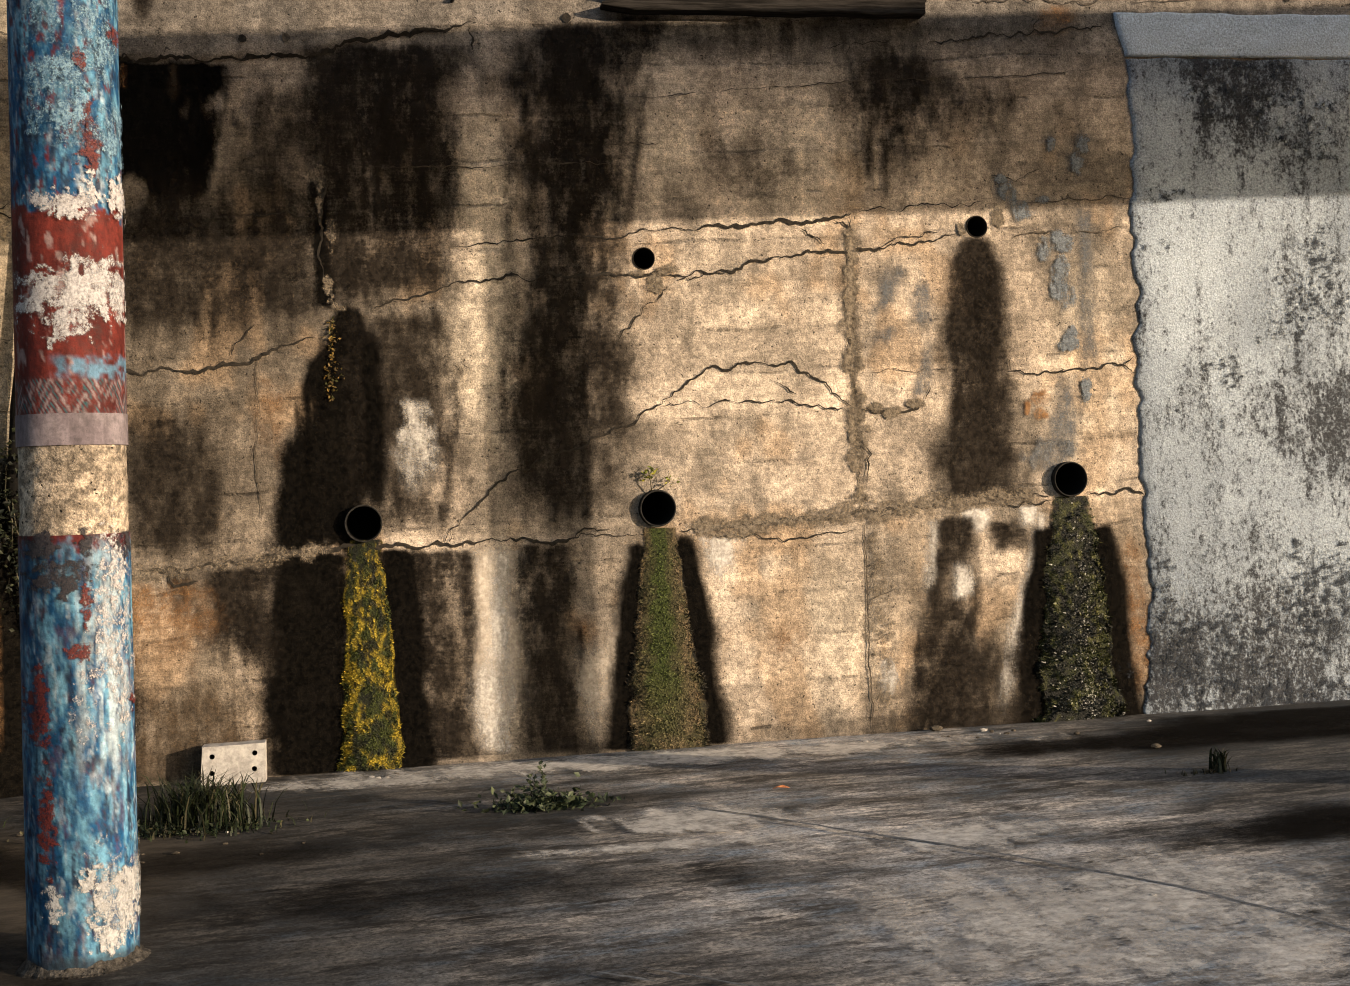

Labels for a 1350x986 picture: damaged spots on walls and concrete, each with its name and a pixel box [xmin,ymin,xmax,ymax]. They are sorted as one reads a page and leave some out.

peeling [16,0,126,226]
crack [119,21,476,63]
peeling [14,253,127,350]
peeling [17,444,330,751]
water stain [119,43,462,781]
water stain [378,543,647,768]
crack [126,313,1051,726]
water stain [677,536,738,744]
crack [371,169,1128,353]
water stain [907,238,1055,731]
crack [1007,356,1135,376]
peeling [78,839,145,956]